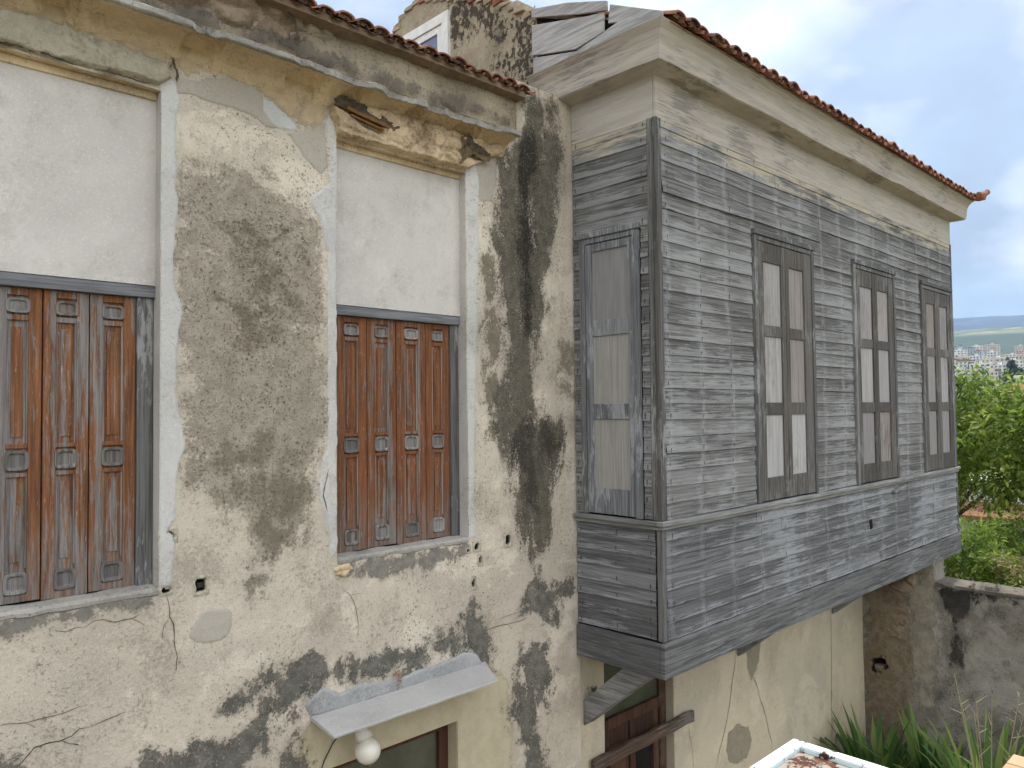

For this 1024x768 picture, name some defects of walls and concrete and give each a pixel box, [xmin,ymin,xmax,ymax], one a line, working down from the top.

spalling [173,158,329,583]
damp [479,88,575,768]
crack [0,705,124,765]
crack [54,595,178,669]
damp [130,597,496,768]
crack [687,654,772,766]
spalling [863,571,920,749]
damp [938,582,1020,669]